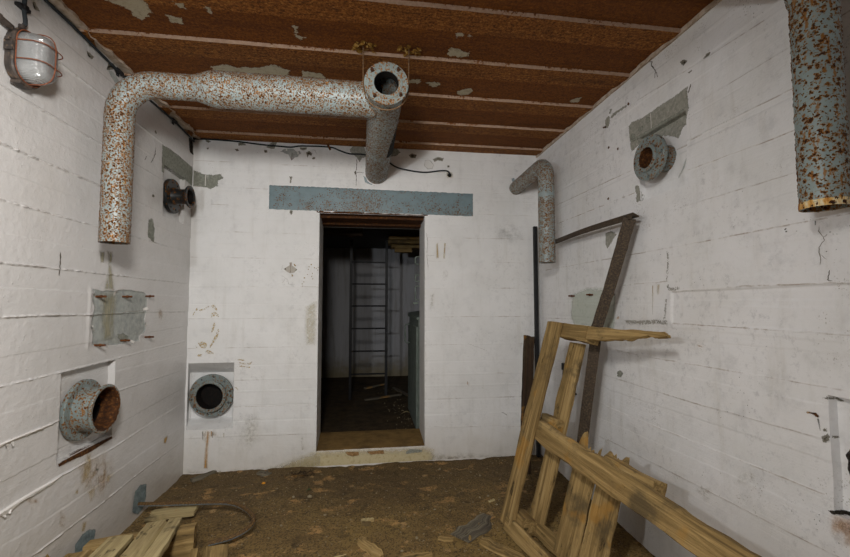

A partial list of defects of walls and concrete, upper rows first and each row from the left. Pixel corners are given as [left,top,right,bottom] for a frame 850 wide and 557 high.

peeling [105,0,151,20]
peeling [212,64,290,76]
peeling [162,145,223,189]